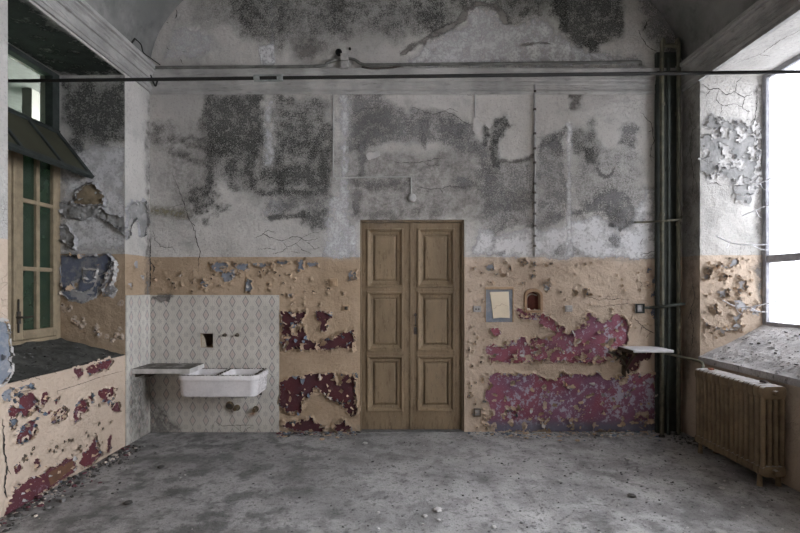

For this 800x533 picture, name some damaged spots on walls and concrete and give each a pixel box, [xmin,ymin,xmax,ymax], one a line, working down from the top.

leakage [219,0,624,68]
leakage [62,77,124,253]
peeling [58,181,151,304]
crack [172,175,201,266]
crack [256,230,319,254]
leakage [147,94,655,260]
crack [702,80,758,145]
peeling [698,110,763,207]
peeling [0,318,122,517]
peeling [279,291,358,355]
peeling [277,370,361,434]
peeling [480,305,658,433]